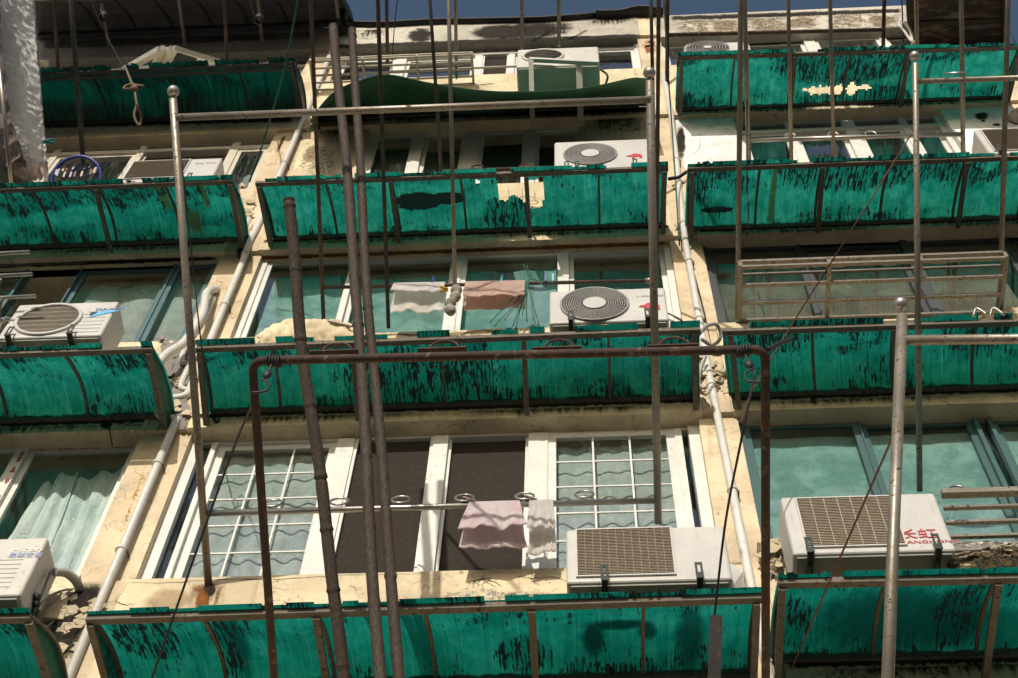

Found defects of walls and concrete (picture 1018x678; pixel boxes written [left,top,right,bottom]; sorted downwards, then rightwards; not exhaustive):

leakage [339,18,635,49]
rust [194,584,220,608]
peeling [56,589,107,667]